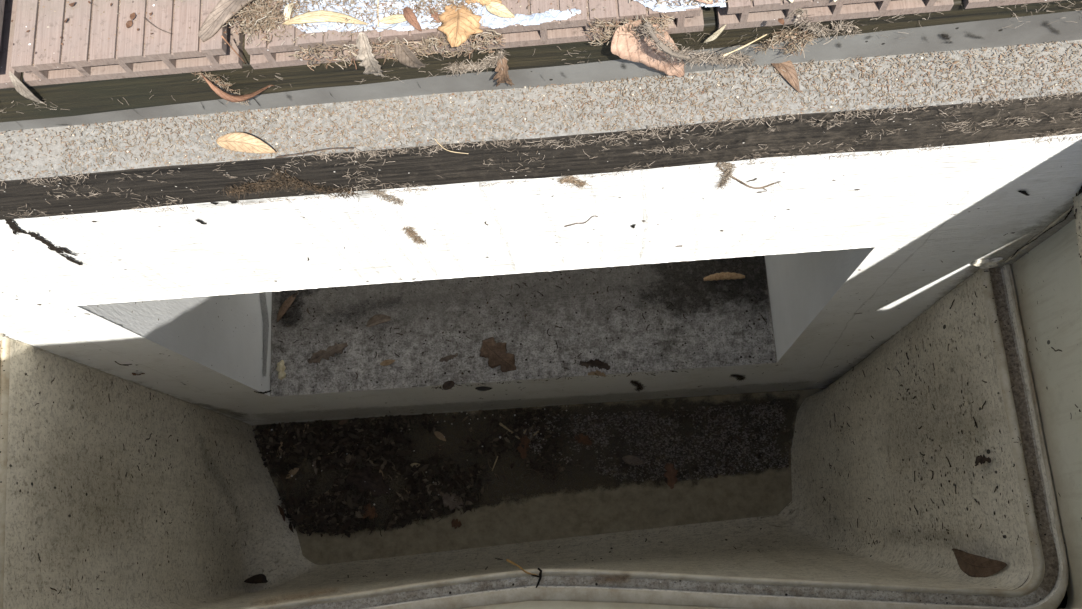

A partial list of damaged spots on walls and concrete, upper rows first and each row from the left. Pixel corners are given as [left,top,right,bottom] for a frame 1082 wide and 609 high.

crack [5,219,88,265]